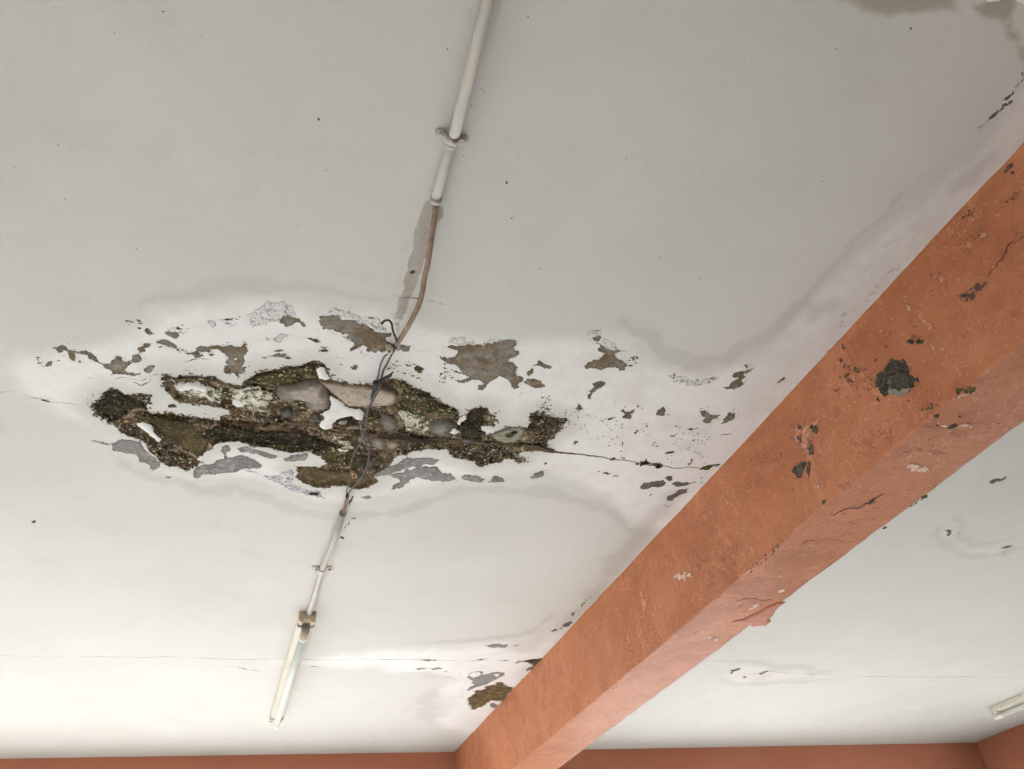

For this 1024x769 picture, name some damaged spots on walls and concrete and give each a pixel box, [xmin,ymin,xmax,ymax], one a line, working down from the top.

water stain [0,0,1024,539]
crack [987,236,1024,277]
spalling [36,195,739,507]
peeling [671,364,753,390]
spalling [831,329,937,411]
crack [554,451,720,470]
peeling [450,671,505,708]